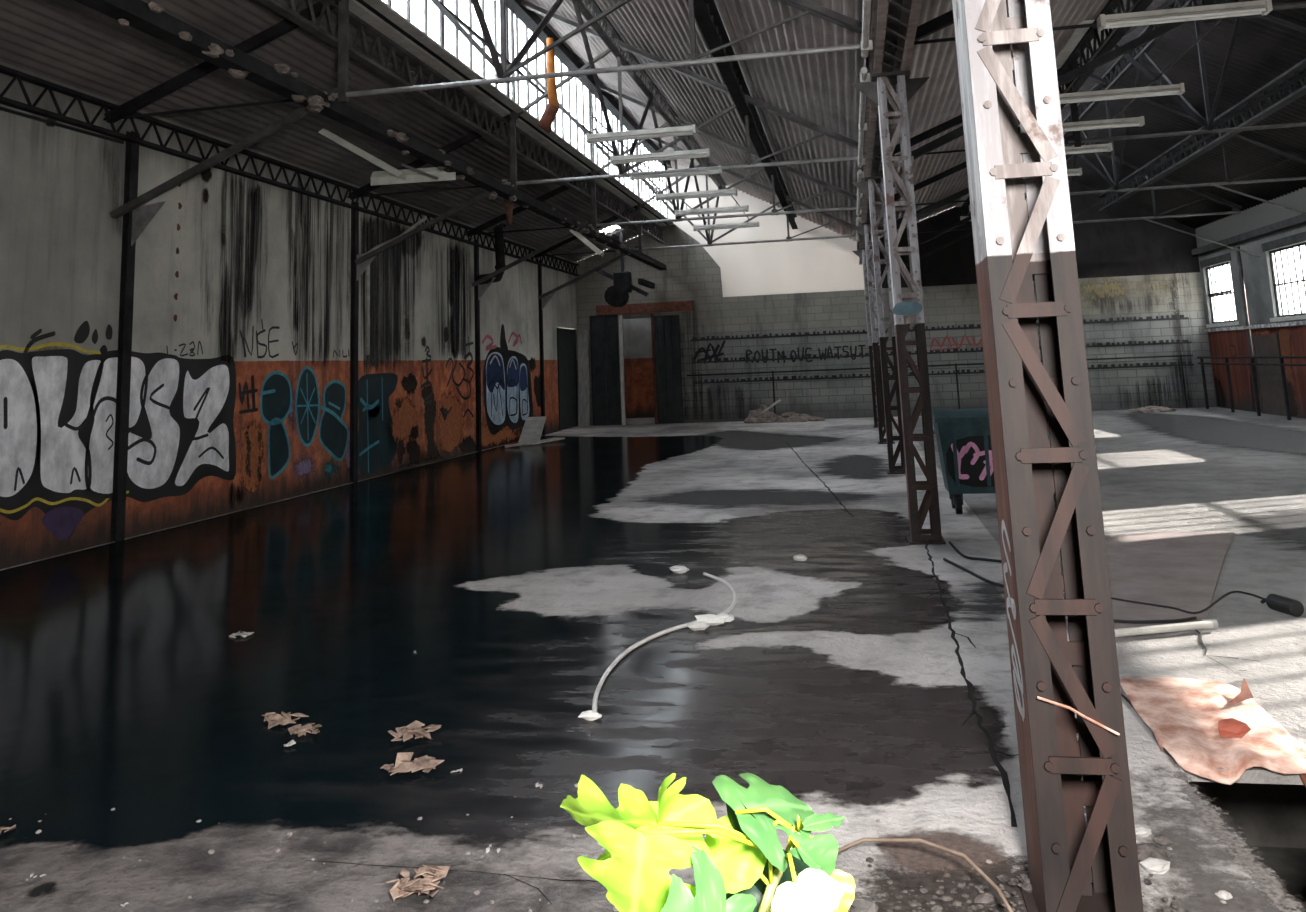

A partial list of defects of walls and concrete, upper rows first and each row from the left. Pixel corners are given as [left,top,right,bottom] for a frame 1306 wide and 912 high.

damp [201,168,262,364]
damp [288,179,471,370]
crack [925,544,1019,827]
damp [955,582,1006,621]